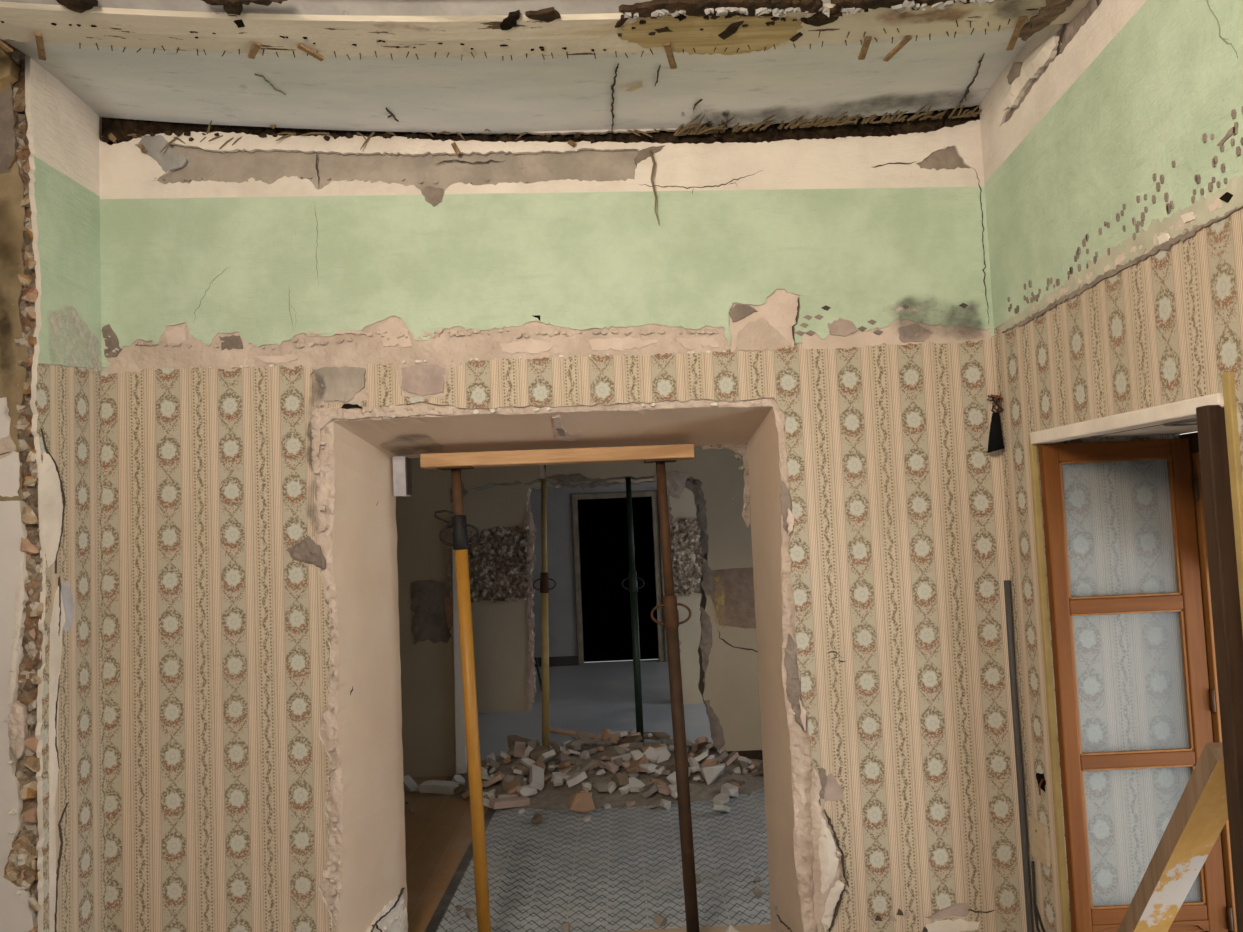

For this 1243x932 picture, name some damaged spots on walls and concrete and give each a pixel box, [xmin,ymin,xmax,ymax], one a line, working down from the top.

crack [611,63,619,133]
peeling [615,0,1006,55]
crack [959,54,984,107]
peeling [1004,0,1102,123]
peeling [135,131,678,207]
crack [644,170,763,193]
peeling [703,133,762,144]
crack [874,160,916,168]
crack [974,169,989,322]
spalling [1001,106,1243,334]
flaking render [0,85,74,932]
spalling [102,289,991,932]